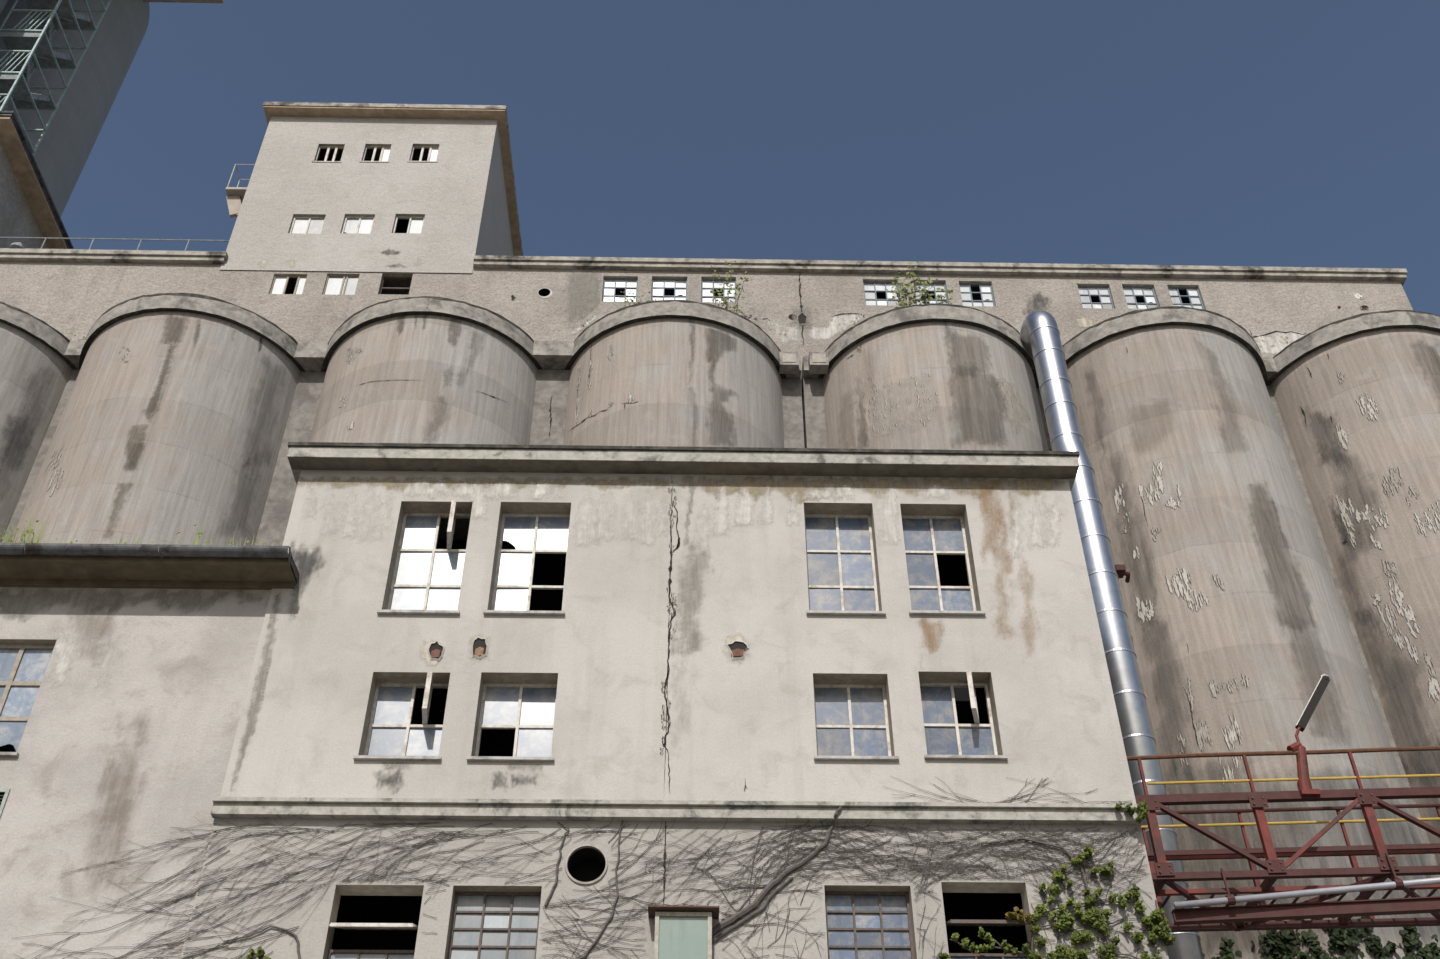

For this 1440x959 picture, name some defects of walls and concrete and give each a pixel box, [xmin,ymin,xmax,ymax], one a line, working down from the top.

damp [691,329,731,364]
damp [0,590,252,618]
damp [292,549,318,589]
damp [301,477,667,545]
damp [682,476,1060,649]
spalling [1135,597,1155,623]
spalling [1113,462,1181,559]
spalling [1165,568,1225,612]
damp [1256,488,1311,629]
spalling [1335,467,1440,702]
damp [239,595,278,764]
crack [660,481,680,904]